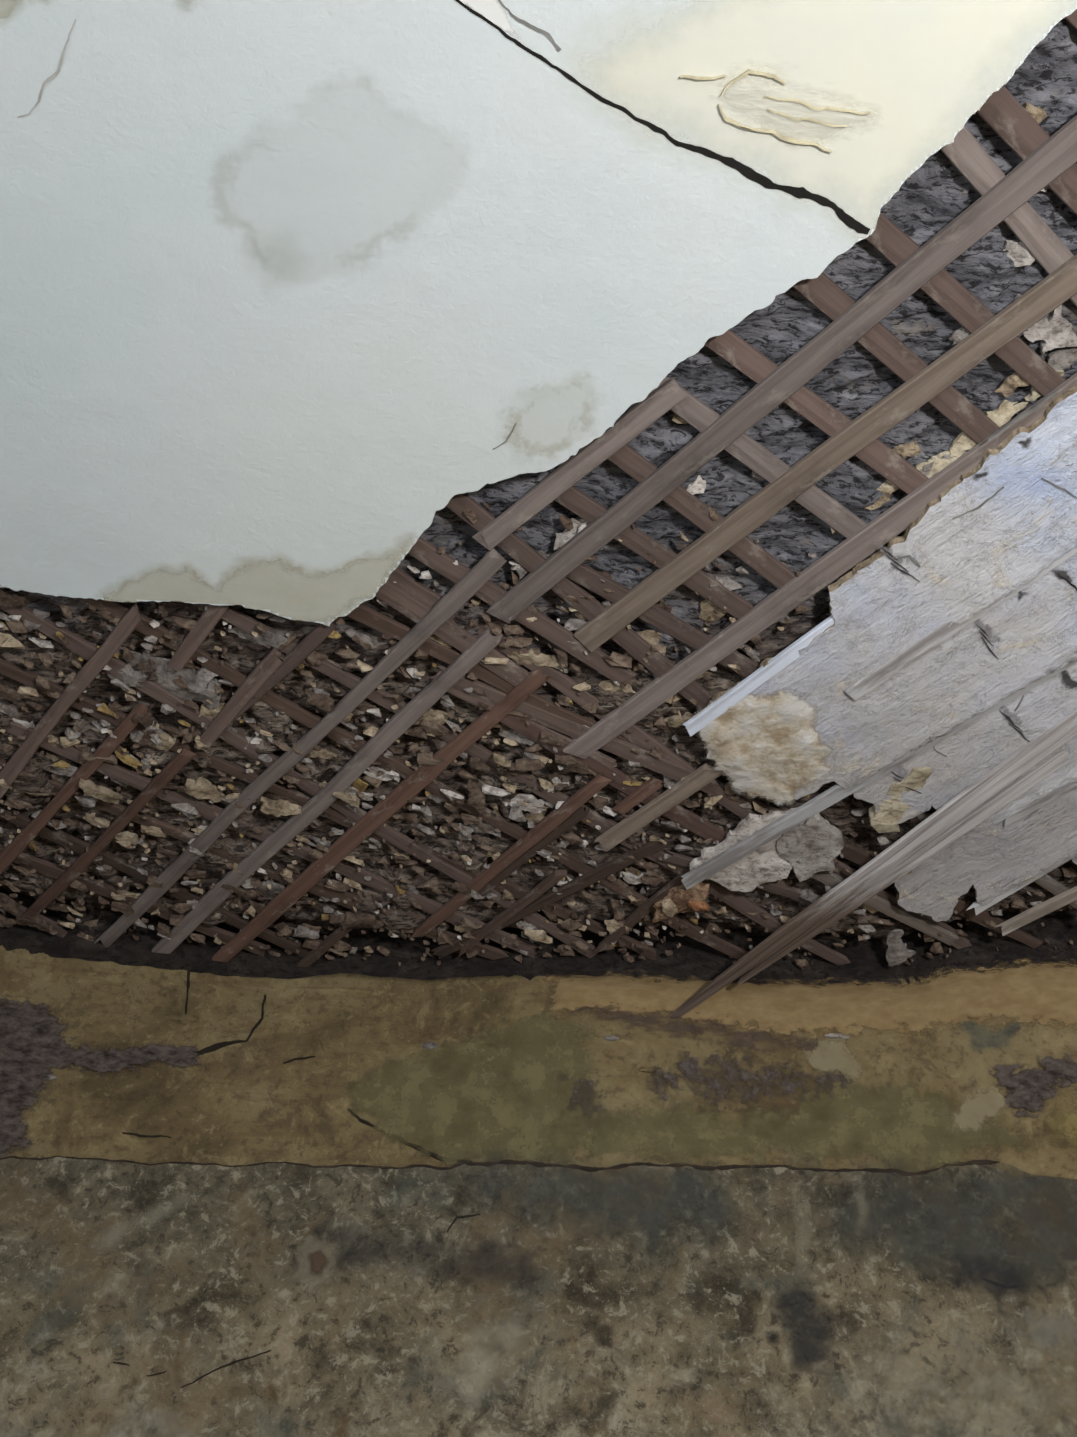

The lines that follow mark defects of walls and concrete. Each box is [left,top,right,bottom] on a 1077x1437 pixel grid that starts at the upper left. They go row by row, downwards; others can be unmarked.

spalling [460,0,518,37]
crack [17,19,76,118]
crack [455,0,870,234]
spalling [965,112,1023,175]
spalling [1004,18,1077,137]
spalling [880,150,981,247]
spalling [823,239,896,302]
spalling [945,221,1049,315]
spalling [730,287,833,366]
spalling [0,289,1077,1182]
crack [0,1108,1000,1176]
leakage [767,1290,832,1367]